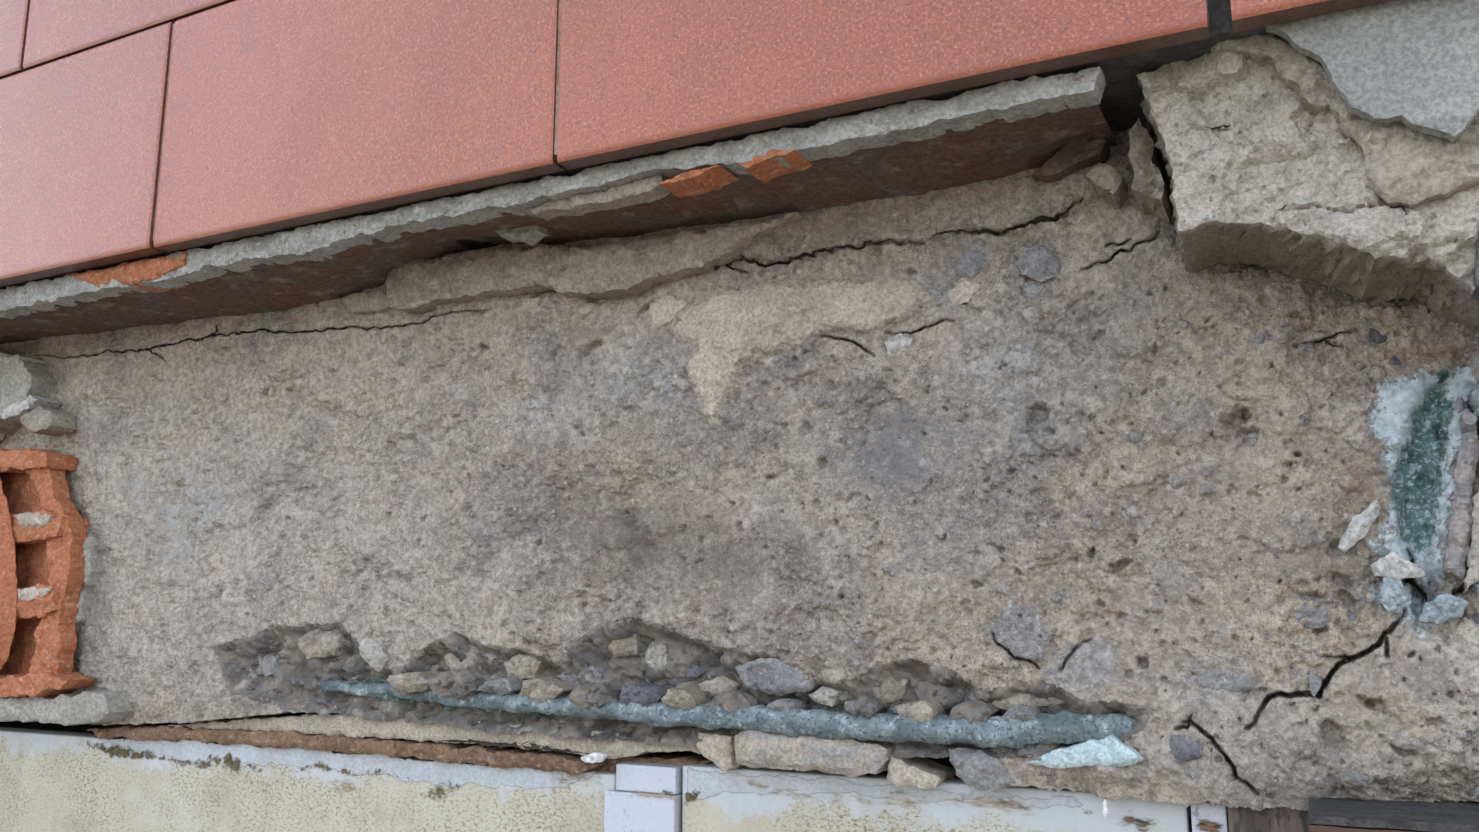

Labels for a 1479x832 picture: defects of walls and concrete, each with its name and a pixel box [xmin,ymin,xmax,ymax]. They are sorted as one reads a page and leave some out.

peeling [519,174,671,221]
flaking render [649,278,923,419]
flaking render [947,280,981,305]
damp [1366,360,1479,638]
spalling [1370,386,1479,625]
rust [355,676,504,714]
spalling [210,617,1153,763]
crack [1178,716,1257,794]
crack [1248,550,1464,728]